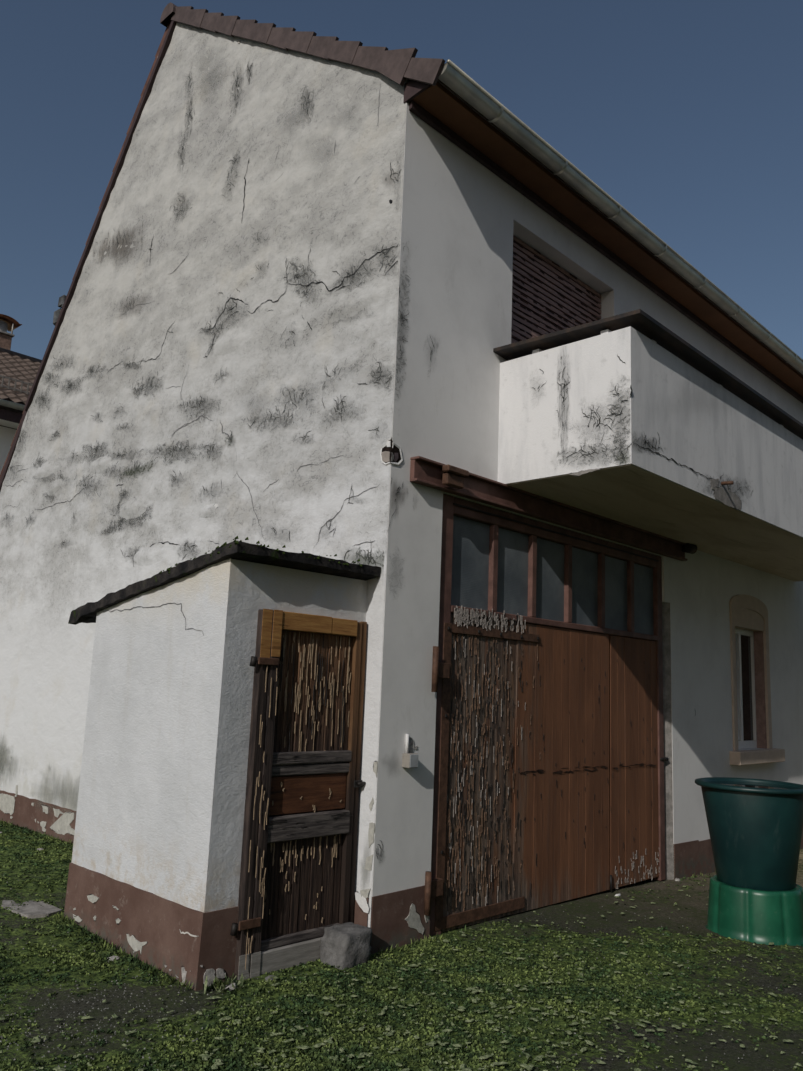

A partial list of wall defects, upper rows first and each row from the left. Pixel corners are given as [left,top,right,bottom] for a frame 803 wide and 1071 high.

crack [206,247,397,357]
leakage [333,246,411,389]
leakage [558,380,663,465]
leakage [154,440,221,481]
leakage [101,489,152,534]
crack [232,455,343,533]
crack [313,486,397,549]
crack [103,603,204,636]
peeling [0,785,18,819]
peeling [31,802,75,836]
flaking render [355,889,371,913]
peeling [113,906,147,954]